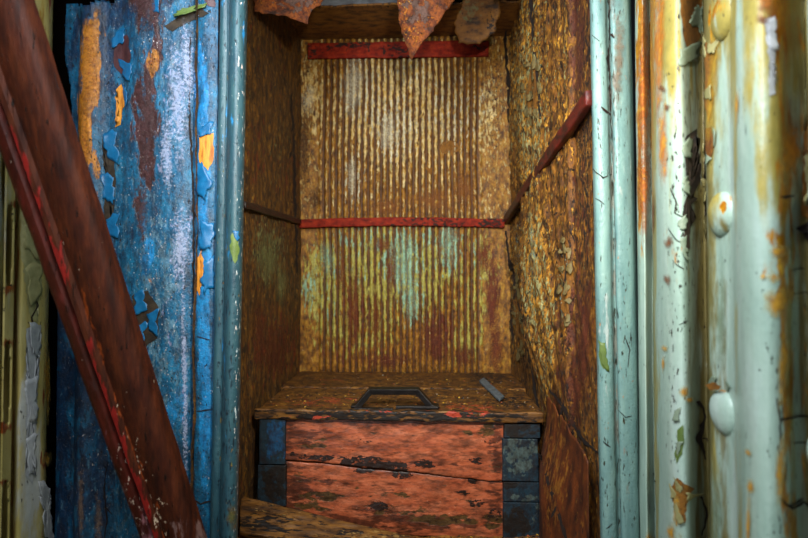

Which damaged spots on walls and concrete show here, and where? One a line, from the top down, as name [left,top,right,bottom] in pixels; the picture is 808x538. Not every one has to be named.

rust [759,0,778,23]
peeling [100,28,132,238]
peeling [195,121,214,200]
rust [637,0,668,250]
peeling [677,0,719,262]
peeling [195,220,216,296]
rust [477,244,502,367]
rust [766,291,793,317]
rust [779,331,789,403]
rust [776,445,784,496]